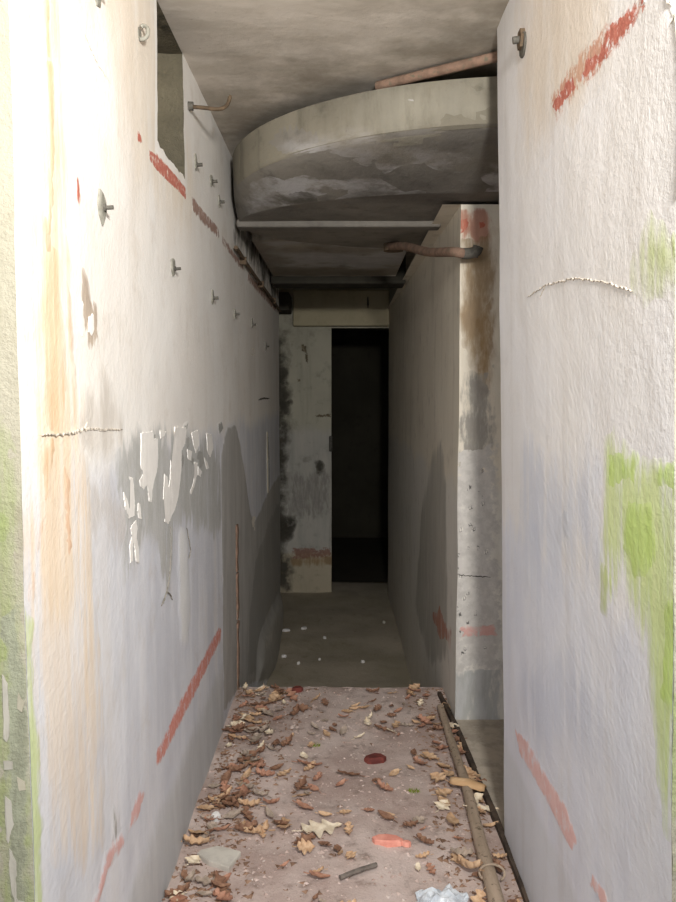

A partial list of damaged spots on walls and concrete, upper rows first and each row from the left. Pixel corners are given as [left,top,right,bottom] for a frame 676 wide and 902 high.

peeling [79,267,99,351]
crack [528,277,632,298]
corrosion [16,0,106,882]
crack [42,422,123,437]
peeling [114,414,223,612]
water stain [121,0,647,902]
water stain [623,501,658,579]
water stain [653,456,674,489]